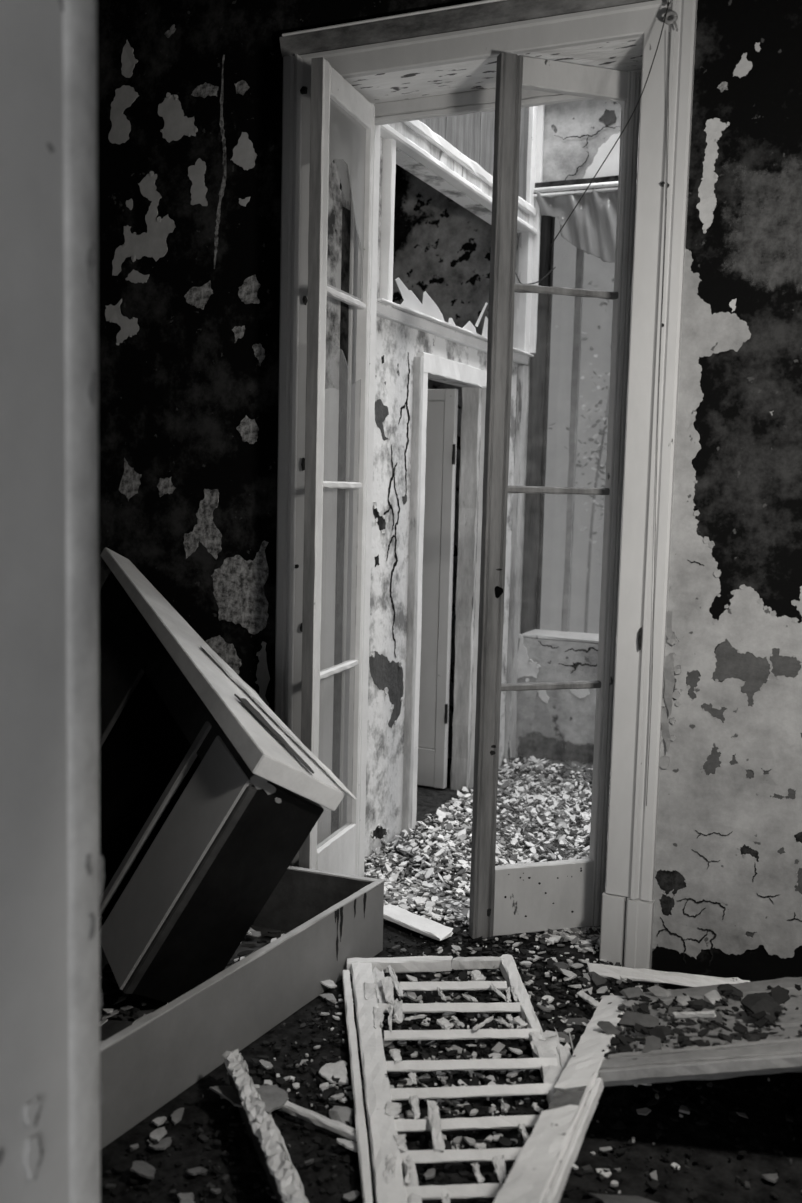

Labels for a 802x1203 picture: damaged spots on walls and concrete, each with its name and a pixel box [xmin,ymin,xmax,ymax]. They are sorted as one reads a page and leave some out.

peeling [717,43,761,93]
peeling [158,82,219,143]
peeling [696,118,730,234]
peeling [112,171,176,283]
crack [381,352,410,657]
peeling [184,489,270,706]
peeling [652,248,802,959]
flaking render [369,651,404,728]
crack [539,641,598,673]
crack [693,830,733,869]
crack [657,898,726,966]
crack [752,865,802,922]